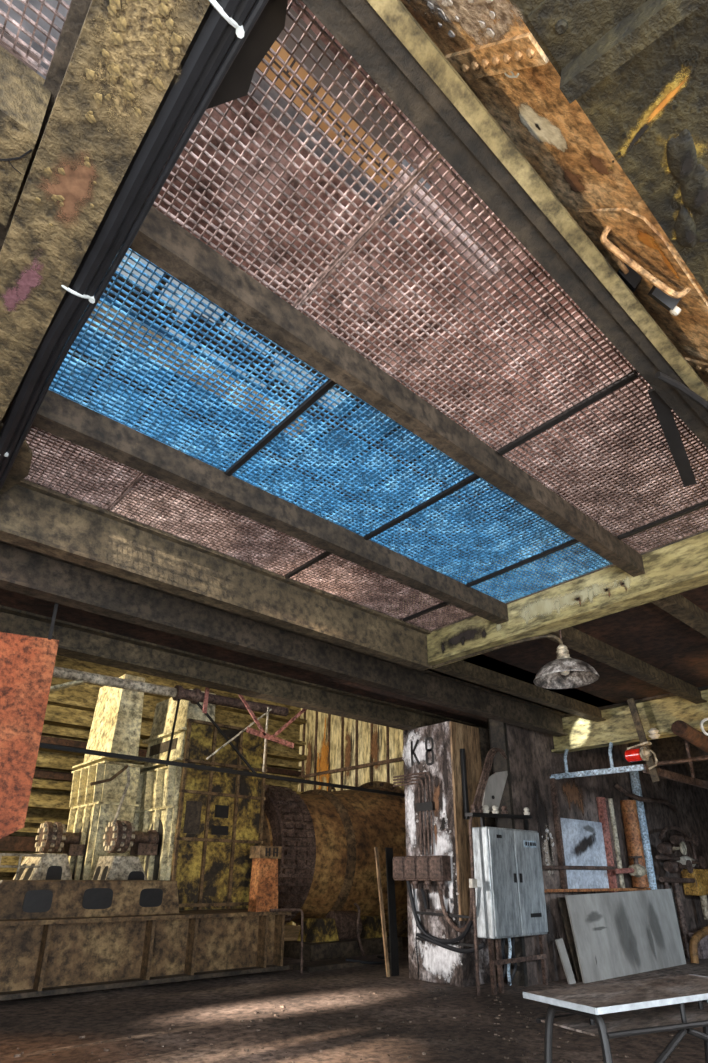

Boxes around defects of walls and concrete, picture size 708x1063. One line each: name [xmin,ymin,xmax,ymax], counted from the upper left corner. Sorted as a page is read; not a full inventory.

rust [560,163,586,195]
rust [589,152,611,175]